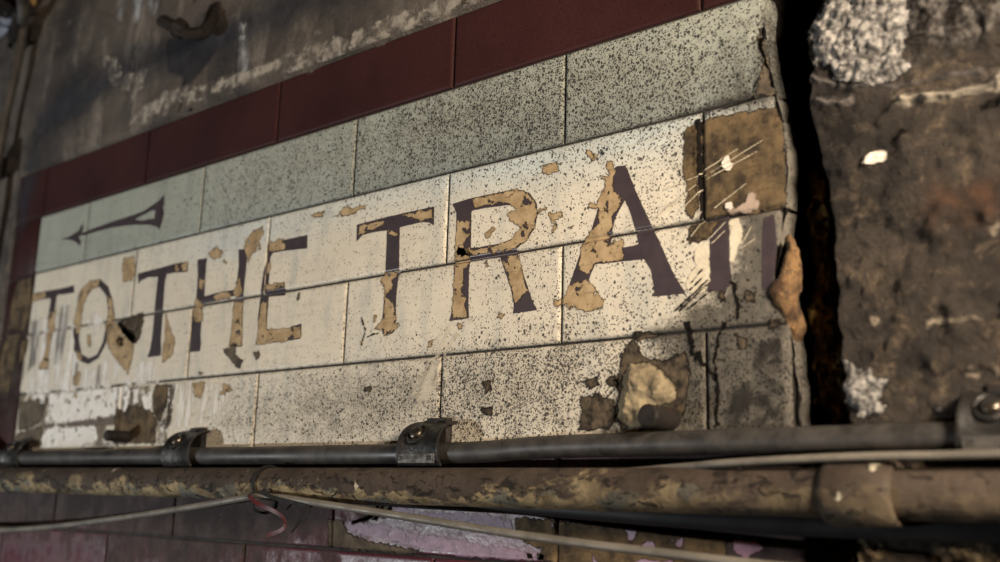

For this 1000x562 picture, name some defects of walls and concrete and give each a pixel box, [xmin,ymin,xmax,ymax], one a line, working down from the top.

spalling [807,0,1000,87]
peeling [682,35,792,244]
crack [694,0,863,426]
crack [894,280,902,306]
spalling [578,330,691,432]
crack [801,453,826,468]
peeling [327,504,764,562]
crack [809,538,864,562]